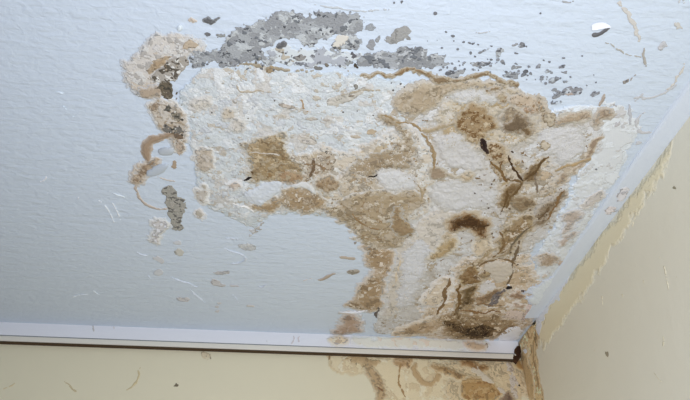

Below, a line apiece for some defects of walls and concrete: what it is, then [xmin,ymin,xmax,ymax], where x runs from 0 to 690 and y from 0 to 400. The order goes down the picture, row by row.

flaking render [150,9,642,335]
leakage [119,31,673,400]